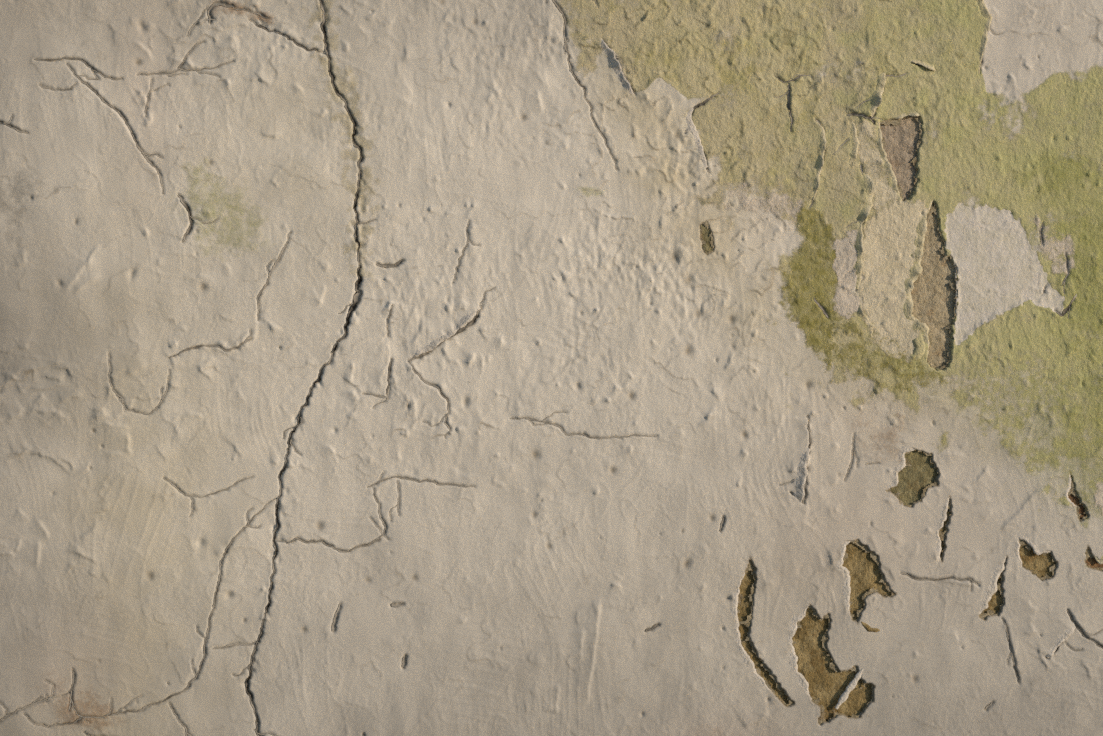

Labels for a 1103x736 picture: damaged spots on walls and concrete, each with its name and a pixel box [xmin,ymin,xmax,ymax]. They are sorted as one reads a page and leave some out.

crack [453,221,480,283]
peeling [559,0,1103,528]
crack [0,0,475,736]
crack [363,287,495,438]
crack [511,412,656,439]
peeling [836,539,895,632]
peeling [979,536,1057,620]
peeling [1085,547,1103,571]
peeling [731,560,794,706]
peeling [787,606,874,725]
crack [1002,618,1020,683]
crack [1045,610,1103,658]